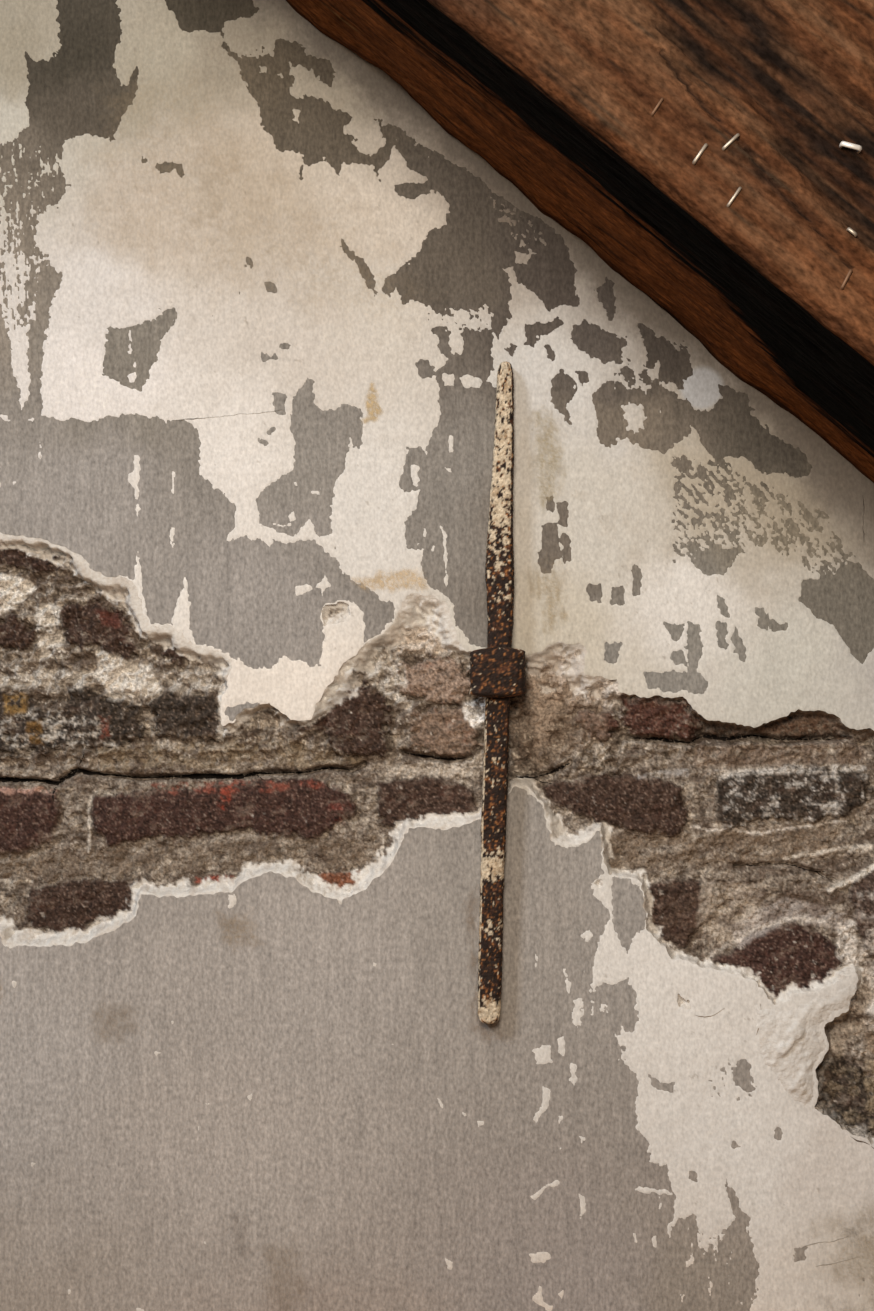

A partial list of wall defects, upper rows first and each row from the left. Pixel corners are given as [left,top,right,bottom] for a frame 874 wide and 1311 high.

peeling [442,373,455,386]
peeling [460,374,482,388]
peeling [486,332,502,387]
peeling [693,385,811,477]
peeling [681,525,743,575]
peeling [295,576,331,596]
peeling [799,558,874,663]
peeling [644,622,708,693]
crack [0,755,365,801]
peeling [572,998,608,1028]
peeling [532,1036,578,1085]
peeling [533,1086,563,1124]